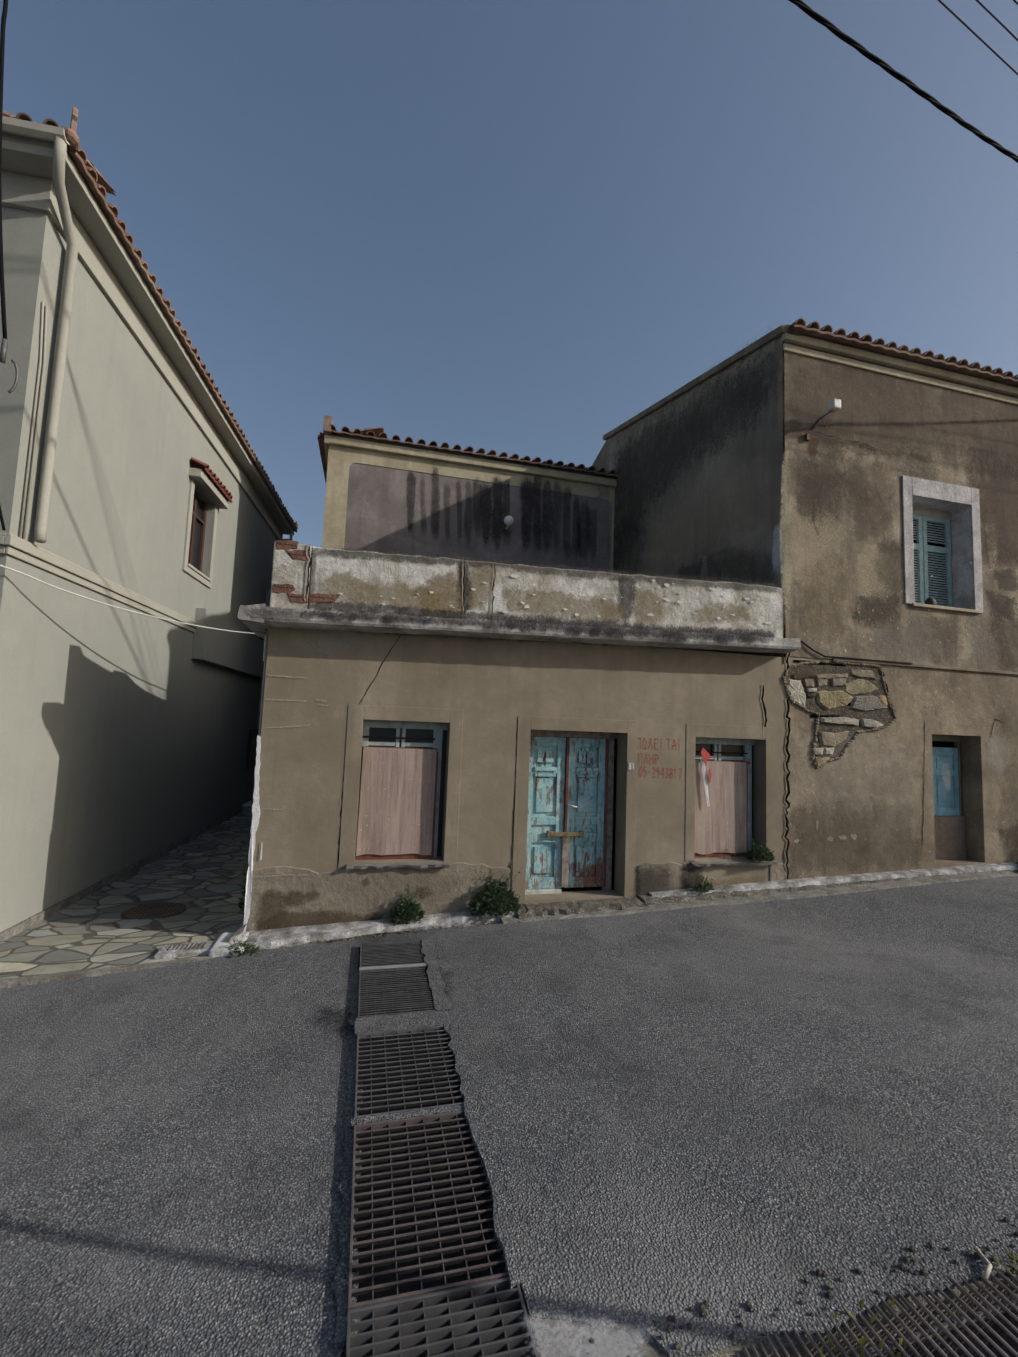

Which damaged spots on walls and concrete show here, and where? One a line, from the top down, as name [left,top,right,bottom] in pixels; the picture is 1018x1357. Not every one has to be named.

flaking render [275,540,309,561]
peeling [273,566,759,624]
water stain [261,351,1018,645]
spalling [782,588,929,769]